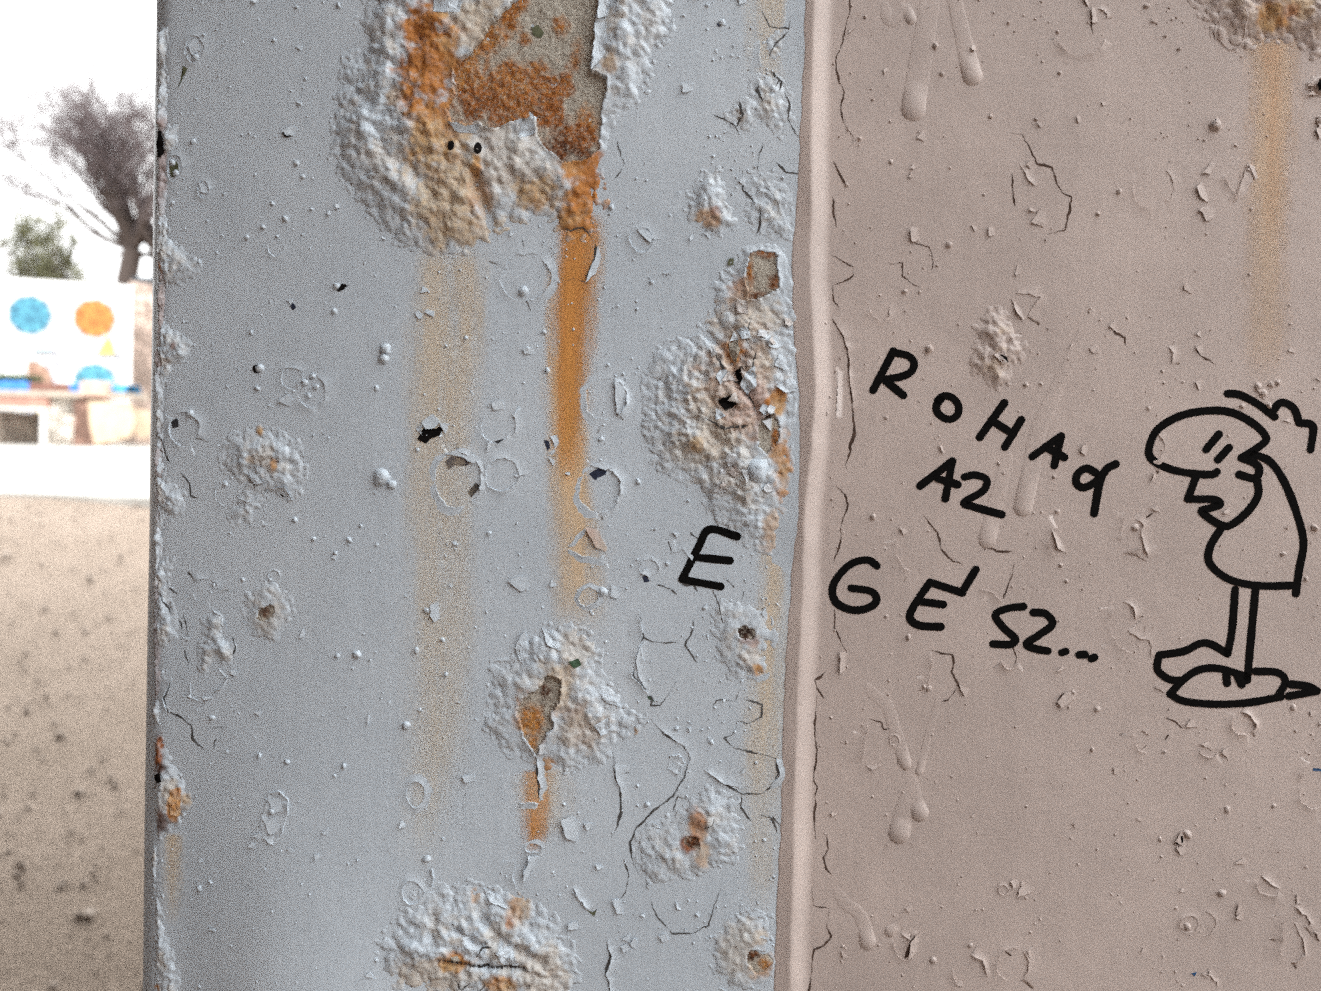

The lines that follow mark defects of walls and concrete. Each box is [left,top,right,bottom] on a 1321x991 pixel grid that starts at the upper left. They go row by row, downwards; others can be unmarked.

rust [552,227,597,597]
peeling [618,216,675,275]
crack [605,580,901,991]